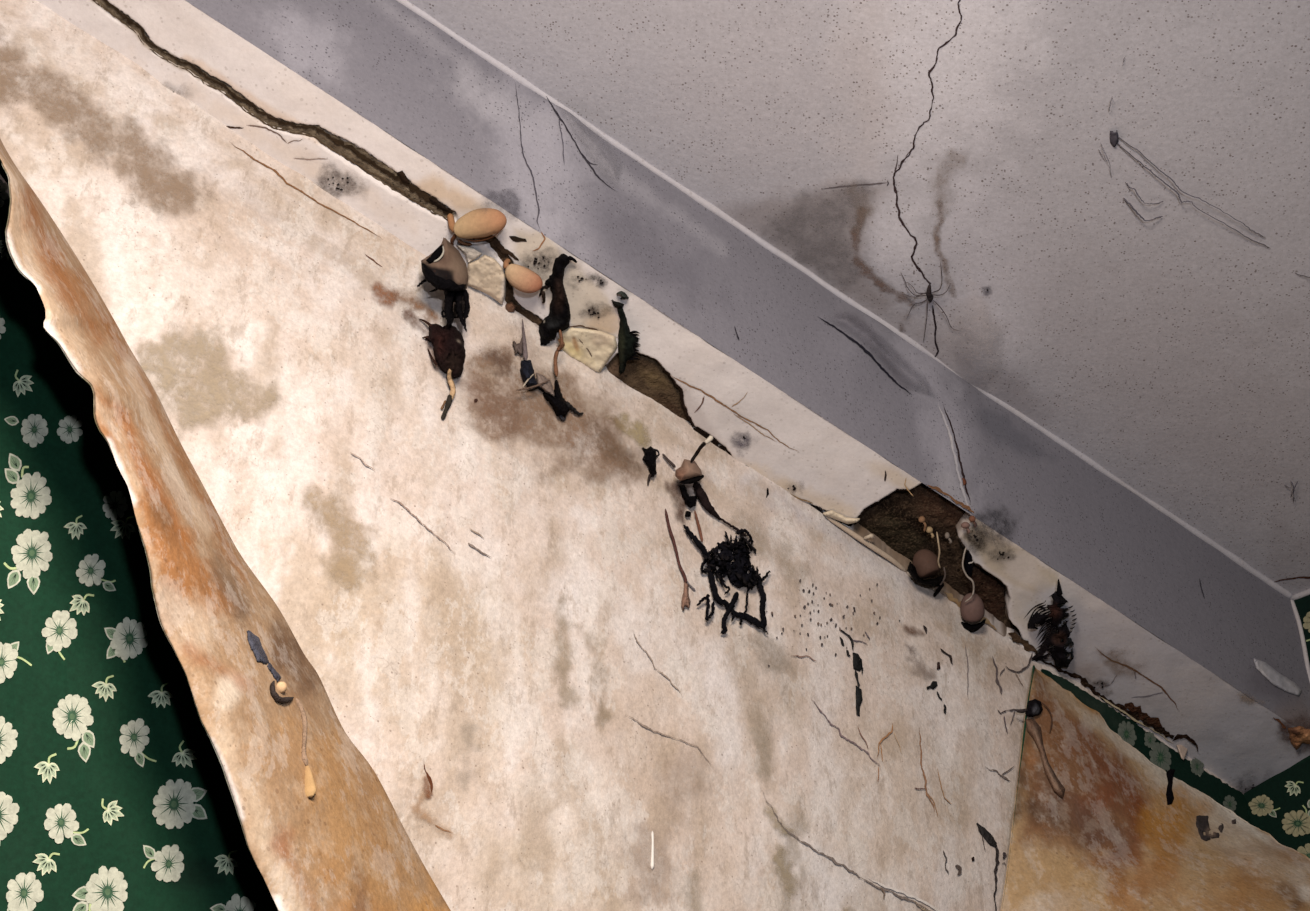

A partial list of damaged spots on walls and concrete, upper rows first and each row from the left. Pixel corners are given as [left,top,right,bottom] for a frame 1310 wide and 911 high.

leakage [0,48,195,213]
crack [93,0,455,267]
mould [320,171,356,196]
peeling [456,244,506,305]
crack [473,84,614,326]
leakage [782,207,907,300]
crack [824,0,962,357]
leakage [469,347,649,480]
flaking render [559,325,732,456]
peeling [0,139,451,911]
peeling [823,483,1310,911]
crack [762,790,940,911]